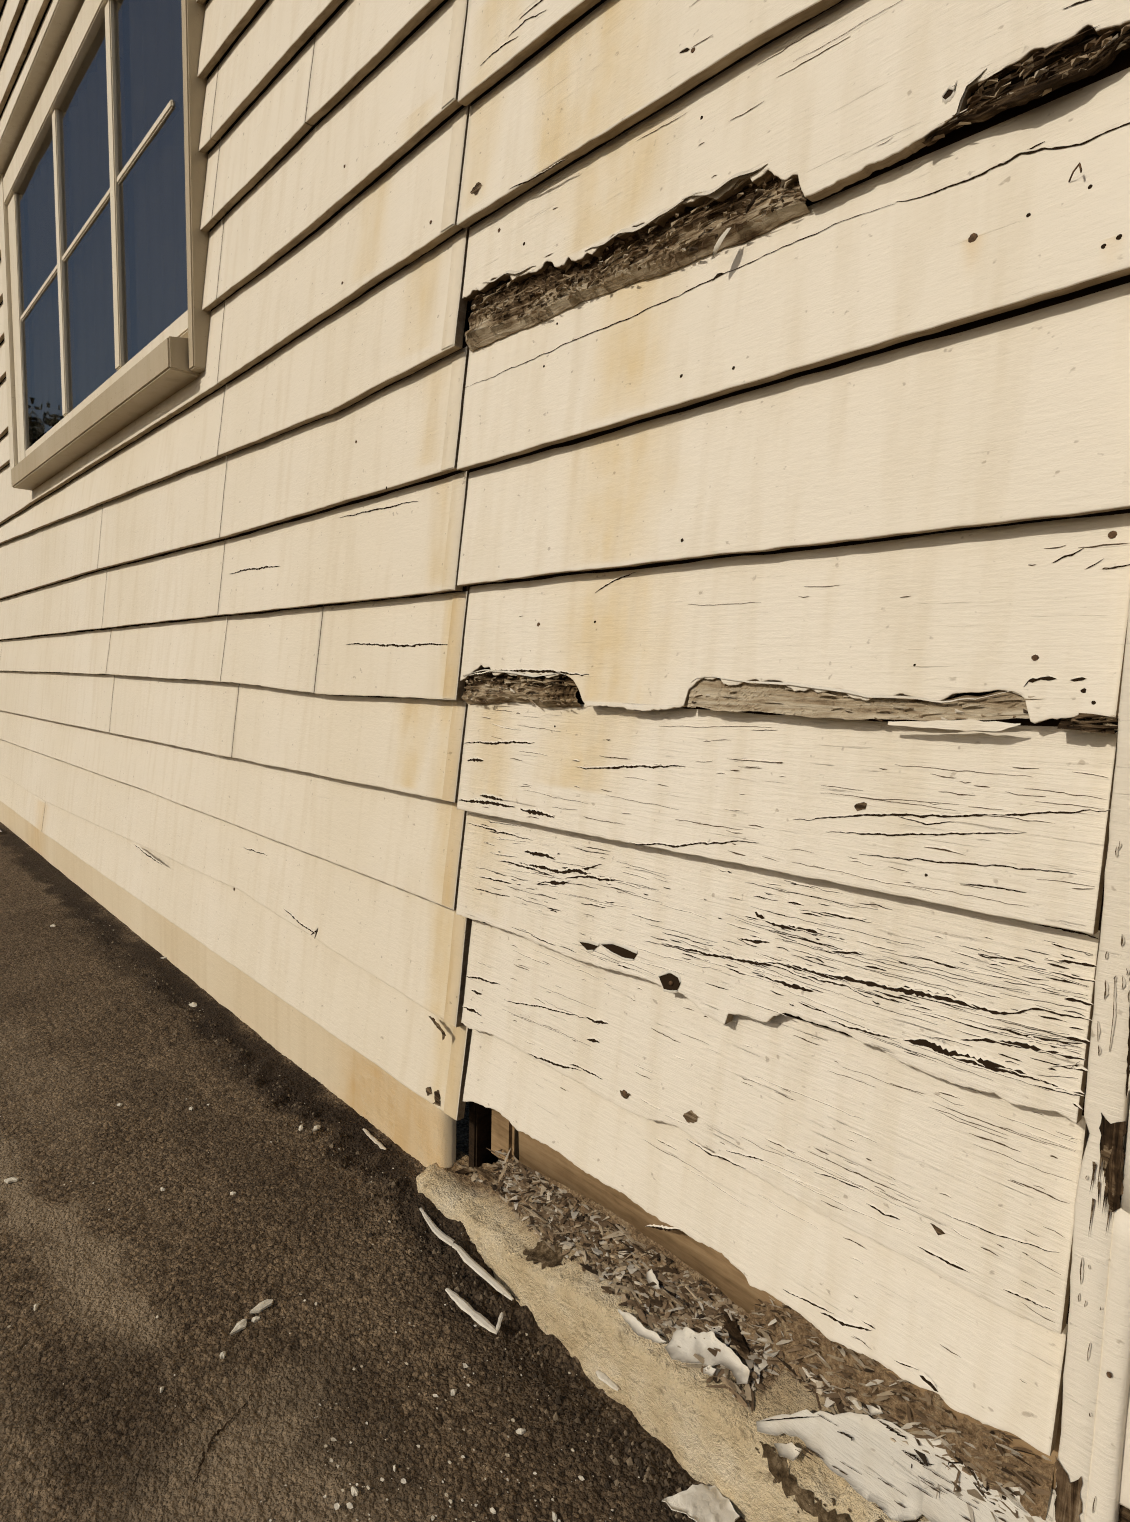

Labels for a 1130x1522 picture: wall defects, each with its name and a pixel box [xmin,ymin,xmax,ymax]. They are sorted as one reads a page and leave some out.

crack [464,121,1130,388]
peeling [693,676,1021,731]
crack [1024,675,1087,686]
crack [459,739,757,885]
crack [662,808,1111,1110]
crack [462,975,609,1079]
crack [1122,1006,1130,1098]
peeling [620,1090,699,1126]
spalling [521,1233,567,1269]
peeling [617,1309,666,1343]
peeling [662,1483,740,1522]
peeling [755,1405,1055,1522]